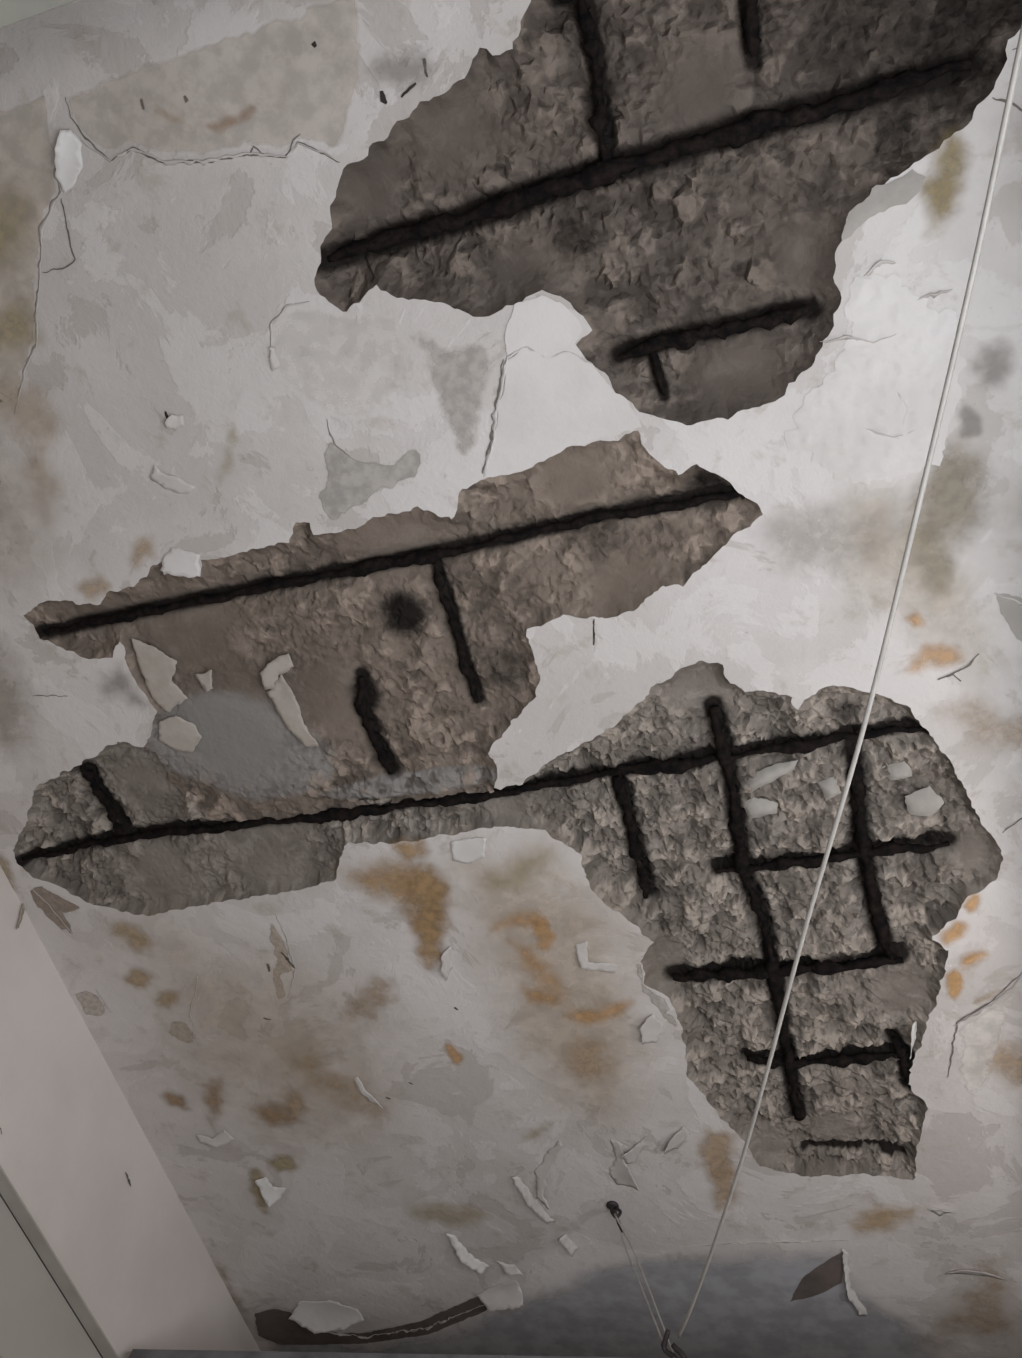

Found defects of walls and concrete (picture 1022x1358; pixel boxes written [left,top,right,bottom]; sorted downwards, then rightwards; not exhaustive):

crack [65,97,340,164]
crack [42,198,76,273]
spalling [0,0,1022,491]
peeling [996,593,1022,641]
spalling [13,419,1003,1180]
corrosion [359,843,444,965]
corrosion [446,1046,462,1063]
peeling [953,976,1022,1089]
peeling [255,1177,287,1208]
peeling [512,1140,563,1224]
peeling [609,1139,639,1191]
peeling [255,1233,925,1358]